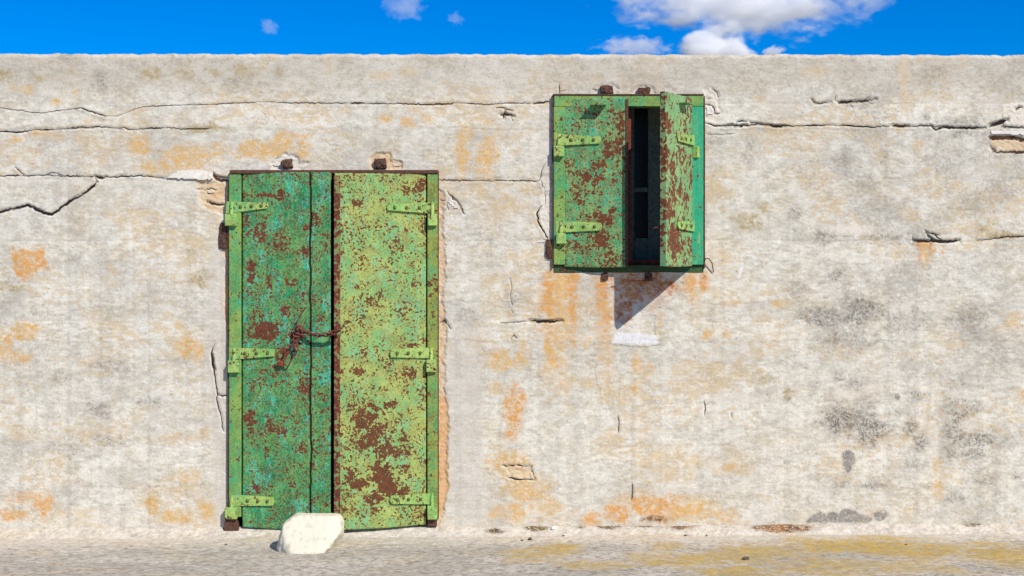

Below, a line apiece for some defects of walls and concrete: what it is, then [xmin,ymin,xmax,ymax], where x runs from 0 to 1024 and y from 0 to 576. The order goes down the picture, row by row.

crack [0,85,565,133]
crack [707,88,1024,154]
spalling [989,98,1024,153]
crack [0,167,166,215]
spalling [167,170,229,224]
corrosion [9,245,52,285]
corrosion [531,94,711,409]
crack [913,231,1024,243]
damp [766,267,1023,357]
damp [798,357,1024,505]
corrosion [578,487,681,526]
mould [804,507,889,525]